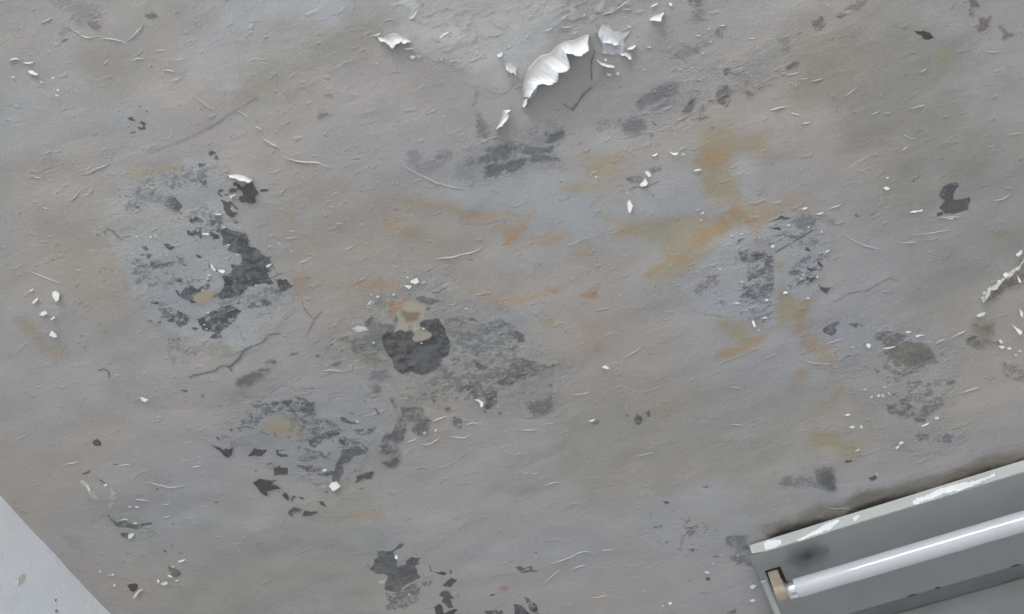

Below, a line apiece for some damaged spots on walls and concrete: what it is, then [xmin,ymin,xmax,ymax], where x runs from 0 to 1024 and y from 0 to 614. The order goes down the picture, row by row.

peeling [374,33,420,59]
peeling [496,24,651,130]
peeling [95,144,299,364]
rust [559,159,621,197]
rust [686,205,760,245]
peeling [671,207,838,331]
peeling [936,177,971,219]
peeling [809,250,1024,457]
peeling [211,268,574,517]
peeling [360,543,458,614]
peeling [484,597,539,614]